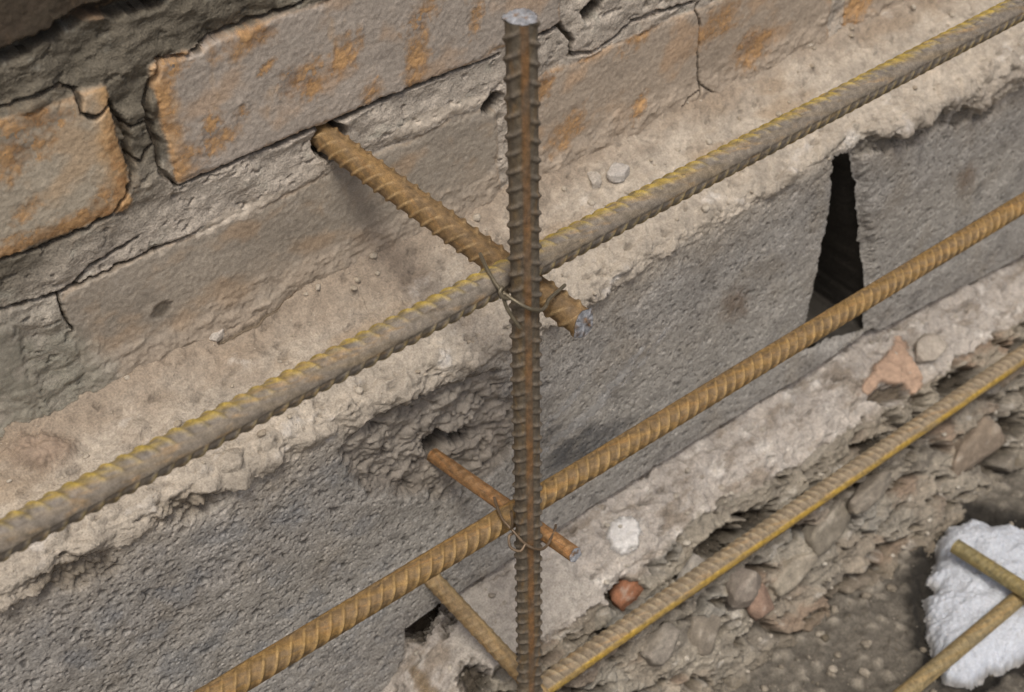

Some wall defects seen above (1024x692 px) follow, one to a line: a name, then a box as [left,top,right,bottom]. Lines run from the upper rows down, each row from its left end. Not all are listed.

crack [682,6,711,106]
spalling [934,372,965,394]
spalling [867,387,901,405]
spalling [995,413,1014,433]
spalling [338,369,513,500]
spalling [852,437,881,454]
spalling [169,494,206,514]
spalling [733,509,766,529]
spalling [693,530,720,555]
spalling [37,551,110,587]